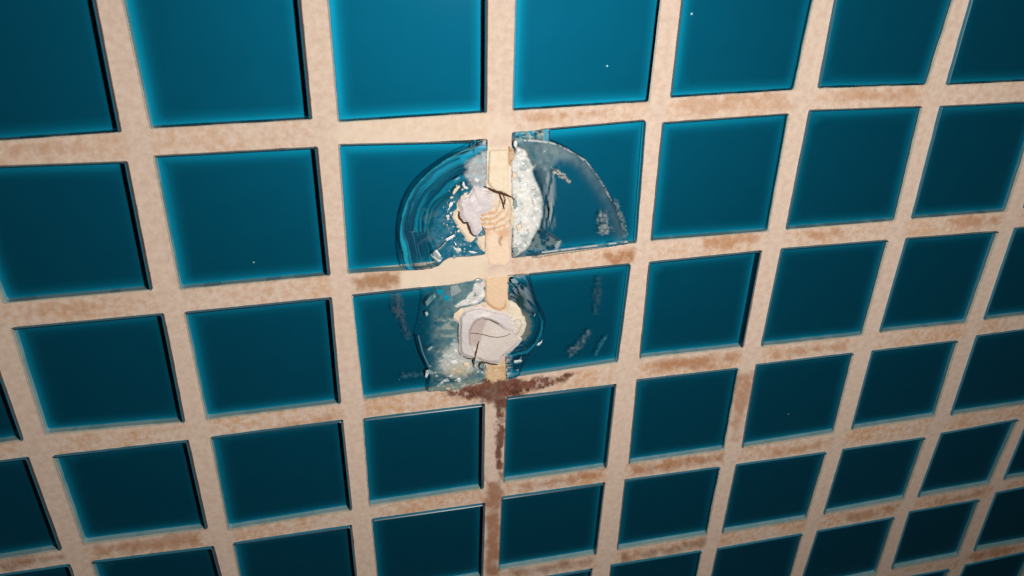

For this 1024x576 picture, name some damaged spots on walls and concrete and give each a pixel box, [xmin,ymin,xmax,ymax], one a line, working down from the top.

crack [458,319,509,371]
corrosion [448,373,574,469]
corrosion [487,483,501,575]